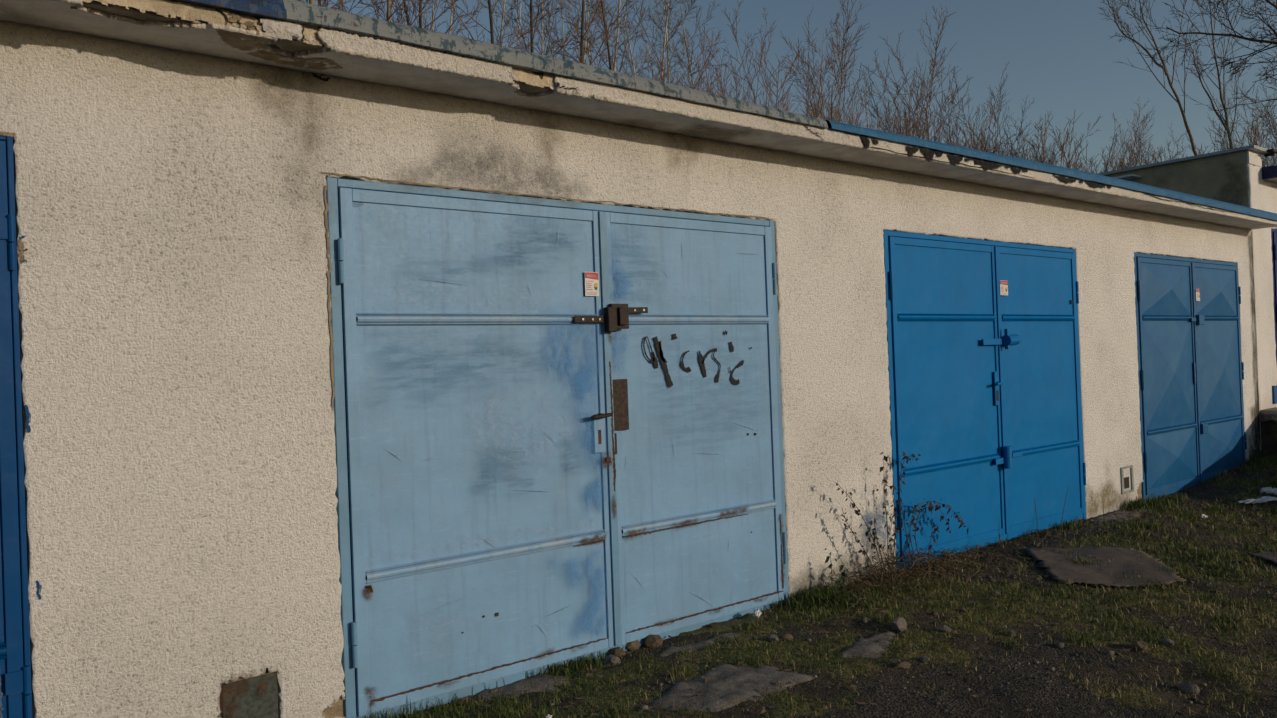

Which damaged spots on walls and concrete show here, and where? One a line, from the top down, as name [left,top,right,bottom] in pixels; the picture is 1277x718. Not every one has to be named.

spalling [70,0,347,70]
spalling [511,68,556,94]
peeling [906,146,1028,174]
peeling [1053,174,1112,188]
corrosion [626,508,747,538]
corrosion [577,534,606,546]
corrosion [367,638,608,706]